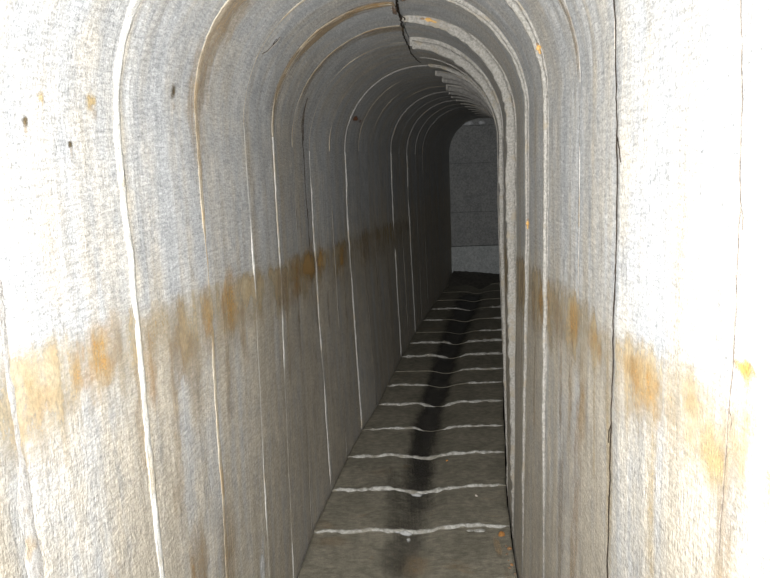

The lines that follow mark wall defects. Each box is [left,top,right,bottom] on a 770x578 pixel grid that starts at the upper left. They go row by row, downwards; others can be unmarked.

crack [395,0,421,63]
corrosion [278,251,323,304]
crack [606,0,621,578]
corrosion [736,361,755,379]
leakage [395,294,482,550]